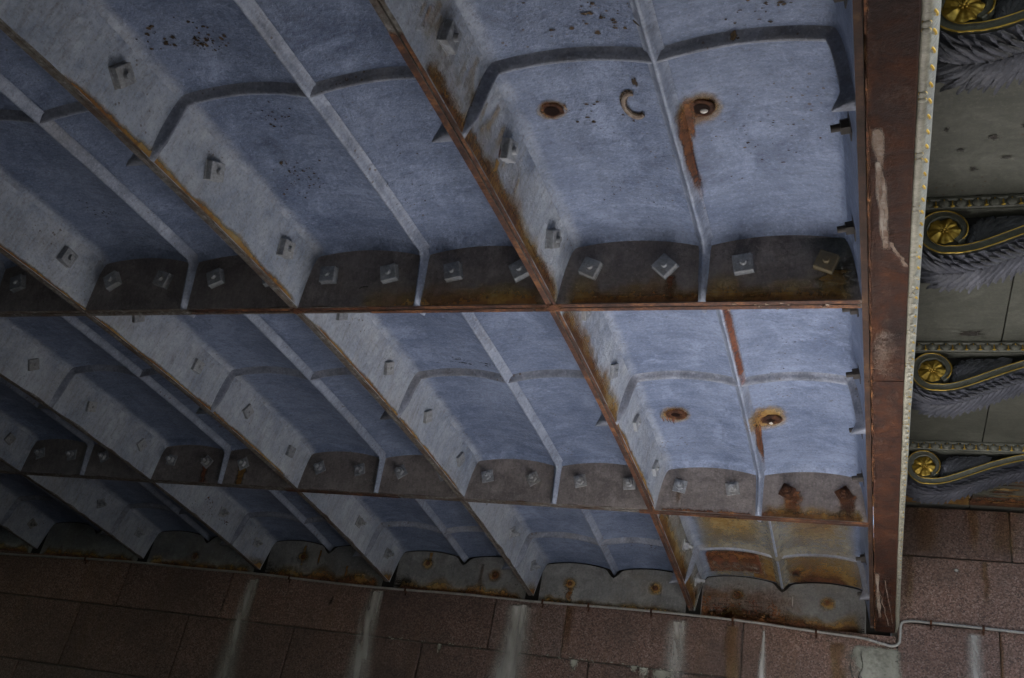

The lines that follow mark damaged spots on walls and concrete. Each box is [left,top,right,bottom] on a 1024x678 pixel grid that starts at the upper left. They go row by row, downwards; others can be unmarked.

corrosion [173,17,229,51]
corrosion [367,64,876,678]
damp [353,591,383,678]
damp [496,605,527,678]